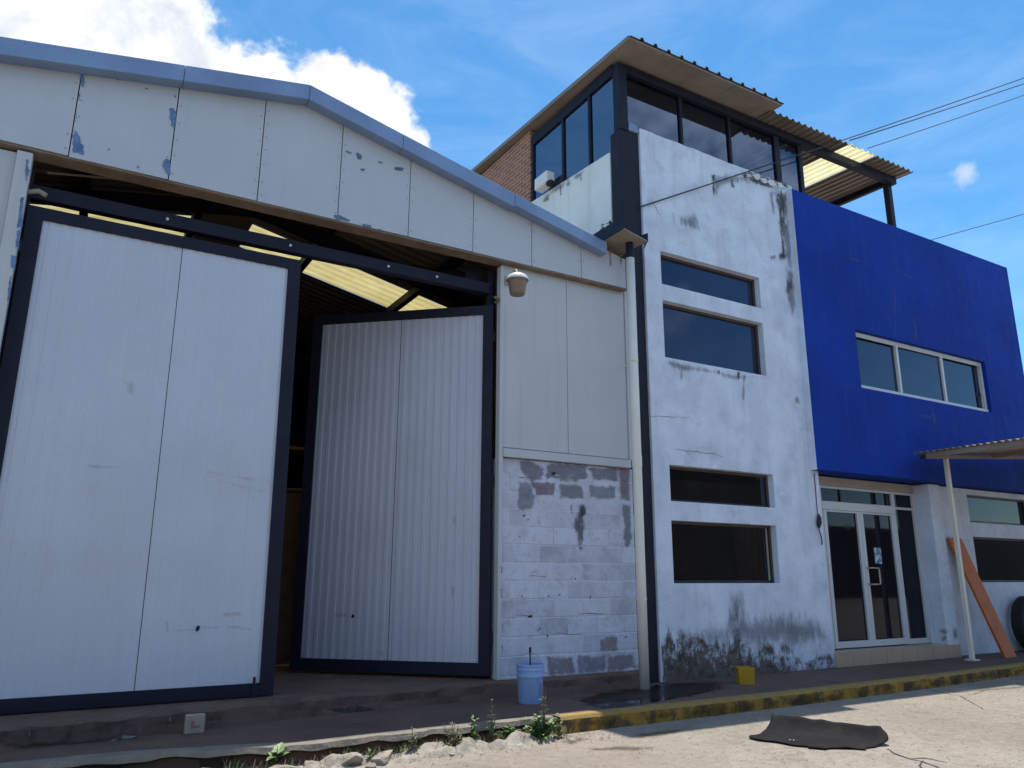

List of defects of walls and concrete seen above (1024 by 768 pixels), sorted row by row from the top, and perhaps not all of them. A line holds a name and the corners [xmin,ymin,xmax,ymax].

peeling [72,131,84,155]
damp [771,191,790,260]
damp [571,505,586,549]
damp [586,604,836,704]